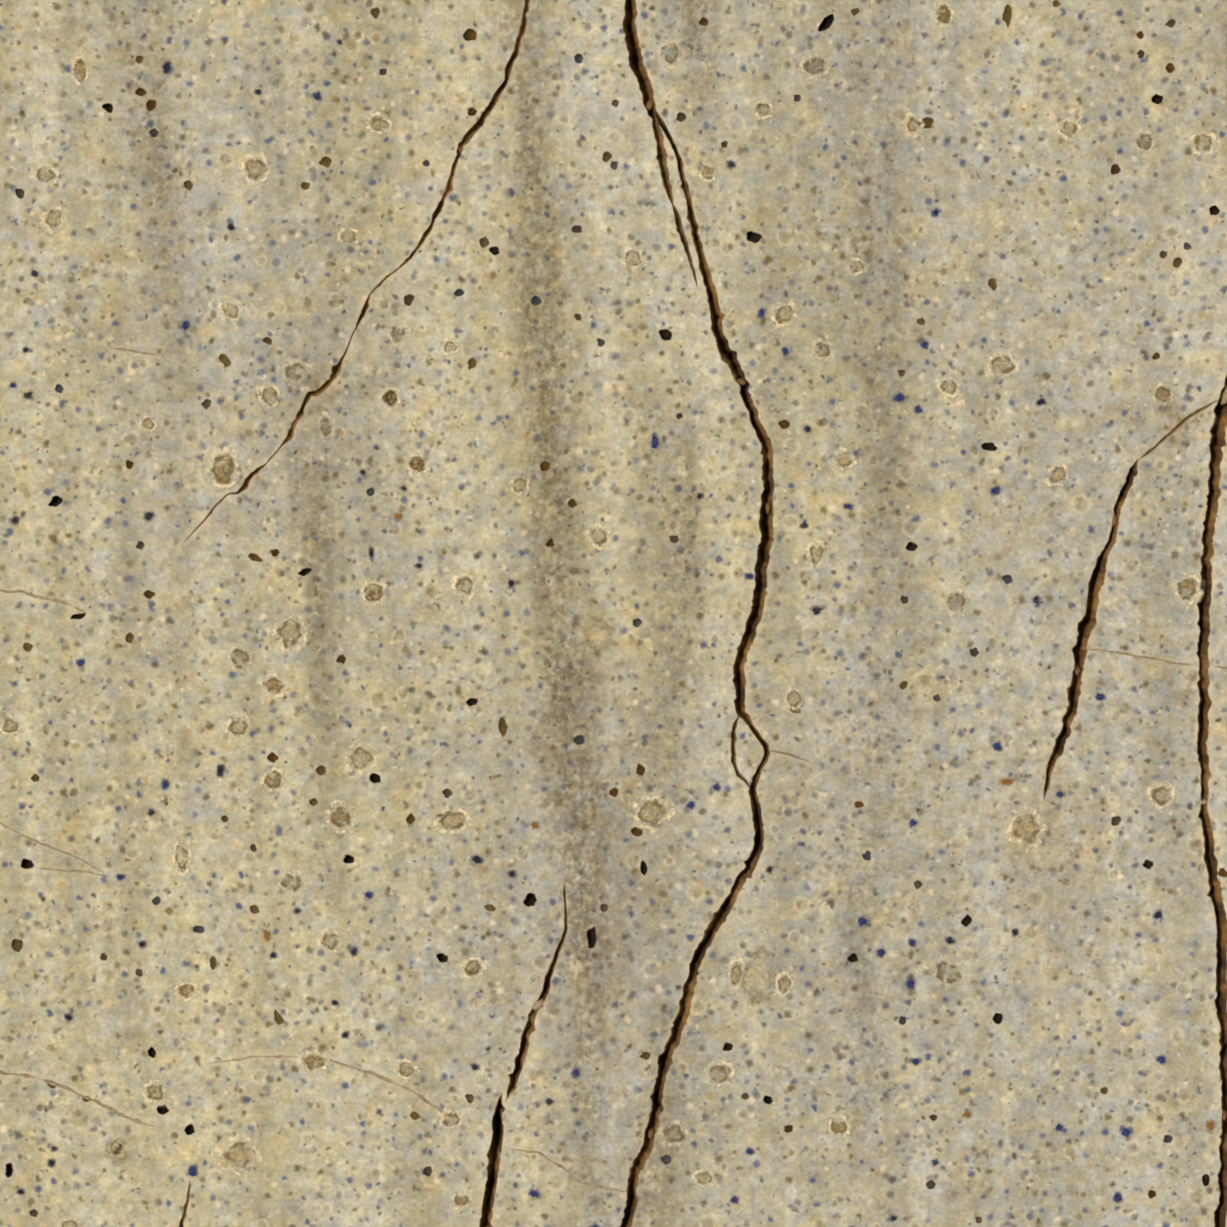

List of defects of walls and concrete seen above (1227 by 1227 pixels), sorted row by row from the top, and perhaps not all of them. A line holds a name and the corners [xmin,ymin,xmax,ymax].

crack [0,589,89,615]
crack [182,0,812,1227]
crack [1043,375,1227,1227]
crack [0,822,111,877]
crack [179,1181,190,1227]